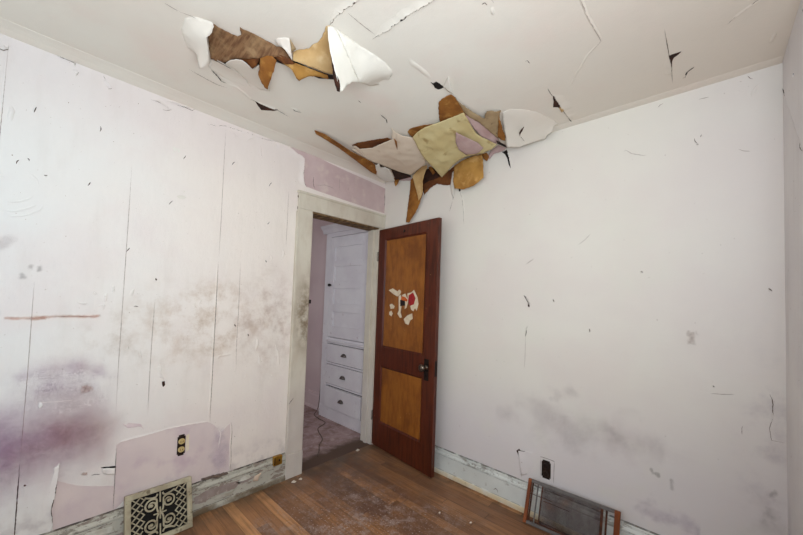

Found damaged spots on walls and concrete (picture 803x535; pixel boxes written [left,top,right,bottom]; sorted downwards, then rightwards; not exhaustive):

peeling [194,472,261,504]